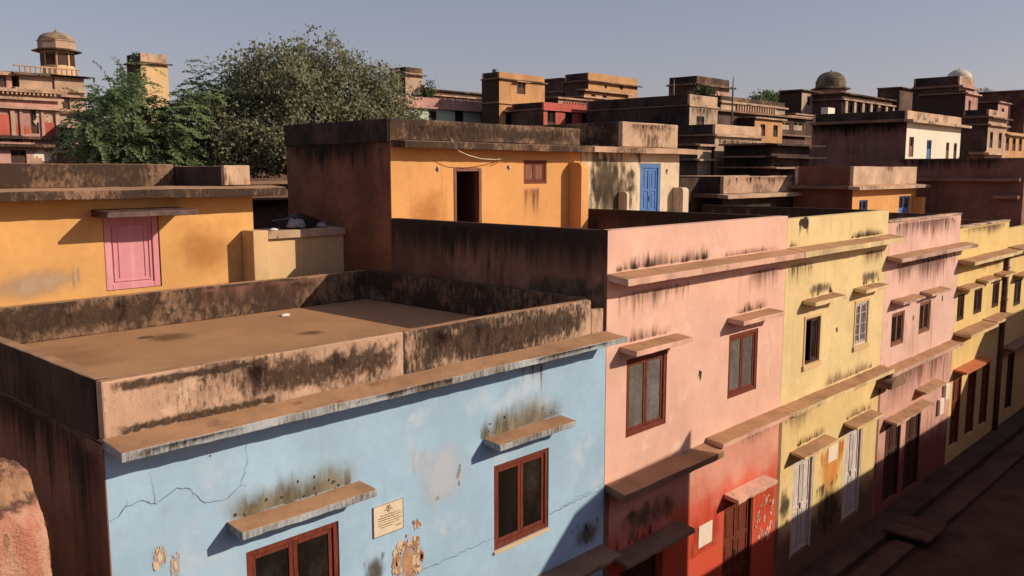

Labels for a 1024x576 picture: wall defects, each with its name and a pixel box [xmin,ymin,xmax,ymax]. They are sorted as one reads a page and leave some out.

water stain [409,123,571,142]
water stain [591,145,635,210]
water stain [617,254,707,271]
water stain [117,343,397,435]
water stain [481,407,555,439]
crack [111,446,248,521]
water stain [234,474,351,517]
peeling [755,494,774,546]
peeling [152,546,181,576]
peeling [391,518,424,576]